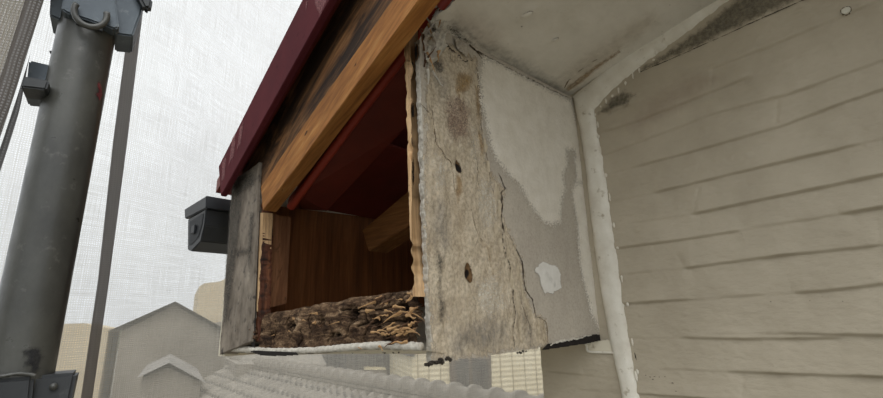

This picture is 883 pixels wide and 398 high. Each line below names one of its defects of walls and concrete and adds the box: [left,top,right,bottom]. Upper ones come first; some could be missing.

crack [421,104,455,189]
peeling [423,3,599,365]
crack [469,44,601,350]